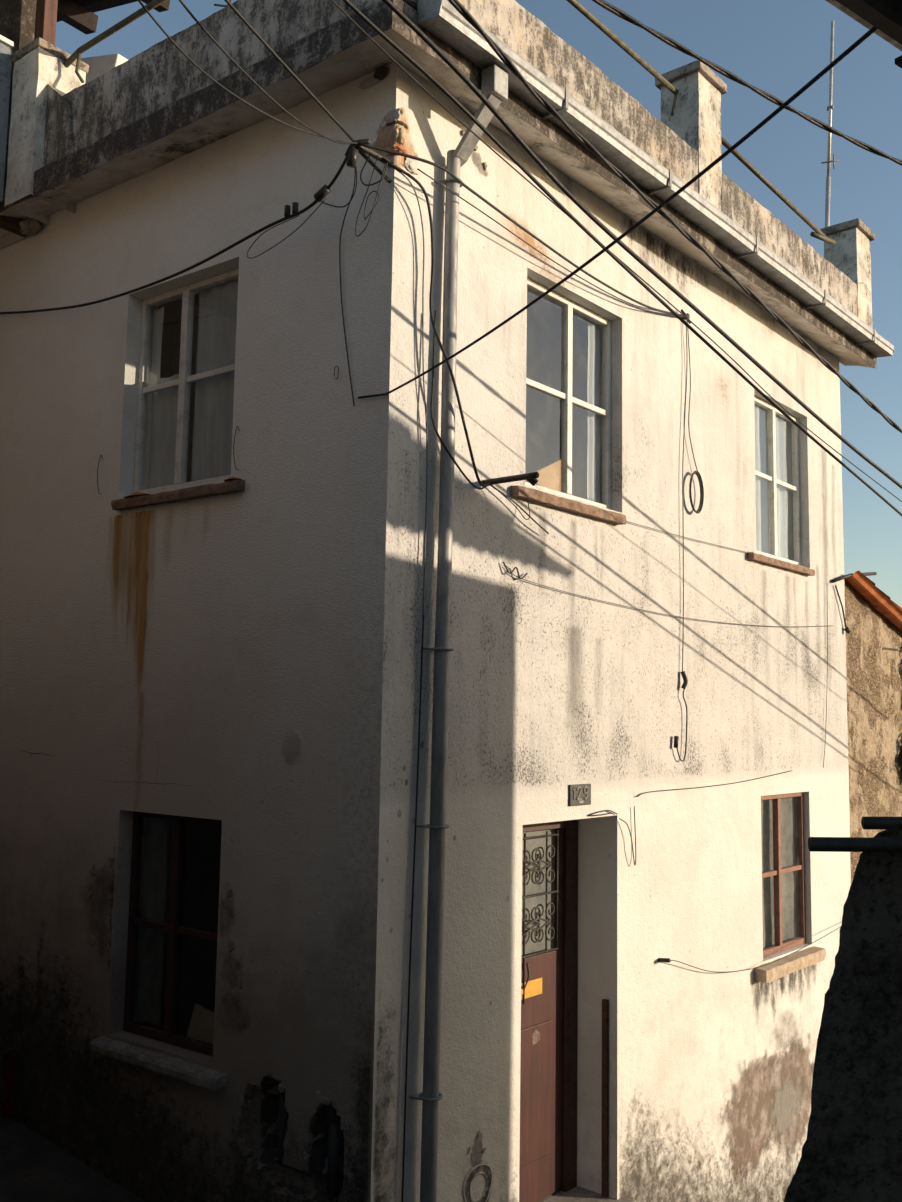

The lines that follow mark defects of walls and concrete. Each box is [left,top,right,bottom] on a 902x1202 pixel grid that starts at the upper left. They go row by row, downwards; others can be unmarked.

flaking render [373,107,420,174]
damp [624,219,686,273]
corrosion [114,511,149,769]
damp [351,1027,394,1202]
mould [620,1112,800,1202]